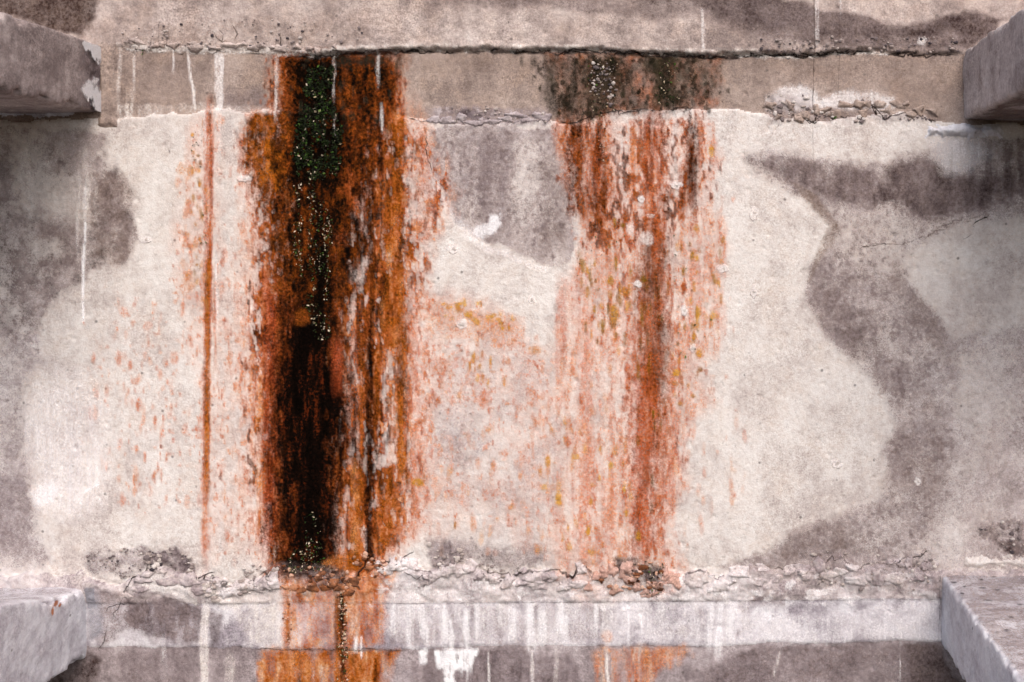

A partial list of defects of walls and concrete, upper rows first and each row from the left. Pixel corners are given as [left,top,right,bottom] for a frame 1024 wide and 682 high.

leakage [0,125,138,565]
rust [141,47,539,682]
spalling [86,540,938,682]
rust [539,85,726,571]
leakage [390,124,1024,682]
spalling [763,94,938,124]